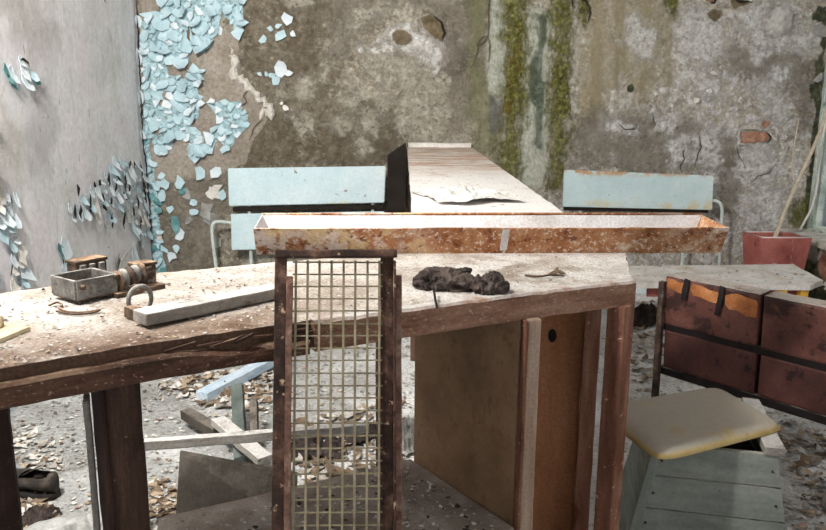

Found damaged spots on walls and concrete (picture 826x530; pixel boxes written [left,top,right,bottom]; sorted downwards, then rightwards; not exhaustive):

flaking render [702,0,721,21]
flaking render [731,0,751,8]
peeling [259,12,296,43]
flaking render [392,30,412,45]
flaking render [421,15,447,43]
peeling [3,46,41,91]
leakage [519,9,552,187]
flaking render [68,0,293,273]
flaking render [737,121,772,146]
peeling [0,177,37,291]